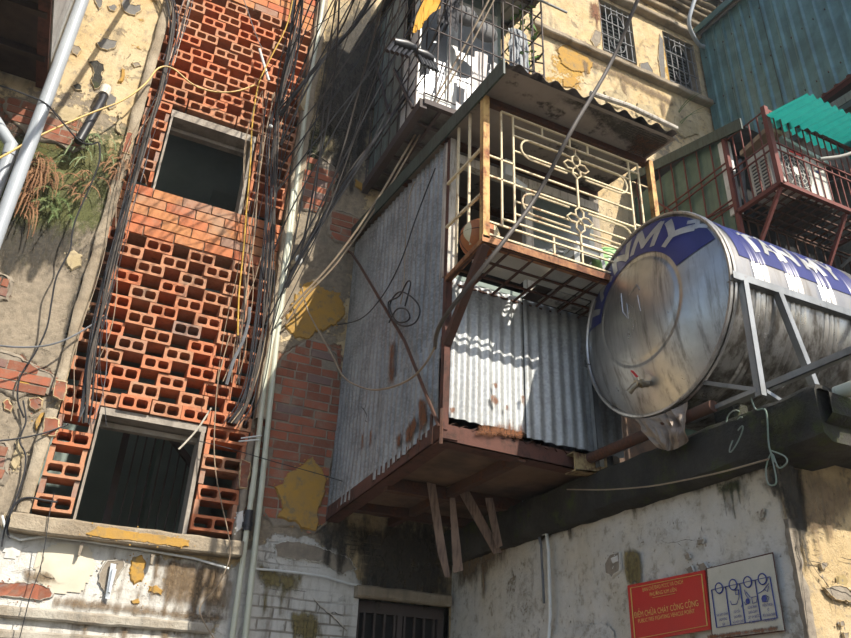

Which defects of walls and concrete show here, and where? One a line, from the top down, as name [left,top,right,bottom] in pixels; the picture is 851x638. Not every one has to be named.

flaking render [94,0,142,17]
flaking render [70,45,105,92]
flaking render [557,43,593,88]
flaking render [0,349,71,438]
flaking render [238,281,357,575]
corrosion [396,399,427,454]
corrosion [478,423,524,437]
spalling [0,578,54,603]
flaking render [79,522,189,604]
damp [259,565,301,614]
damp [324,539,346,572]
flaking render [783,518,817,638]